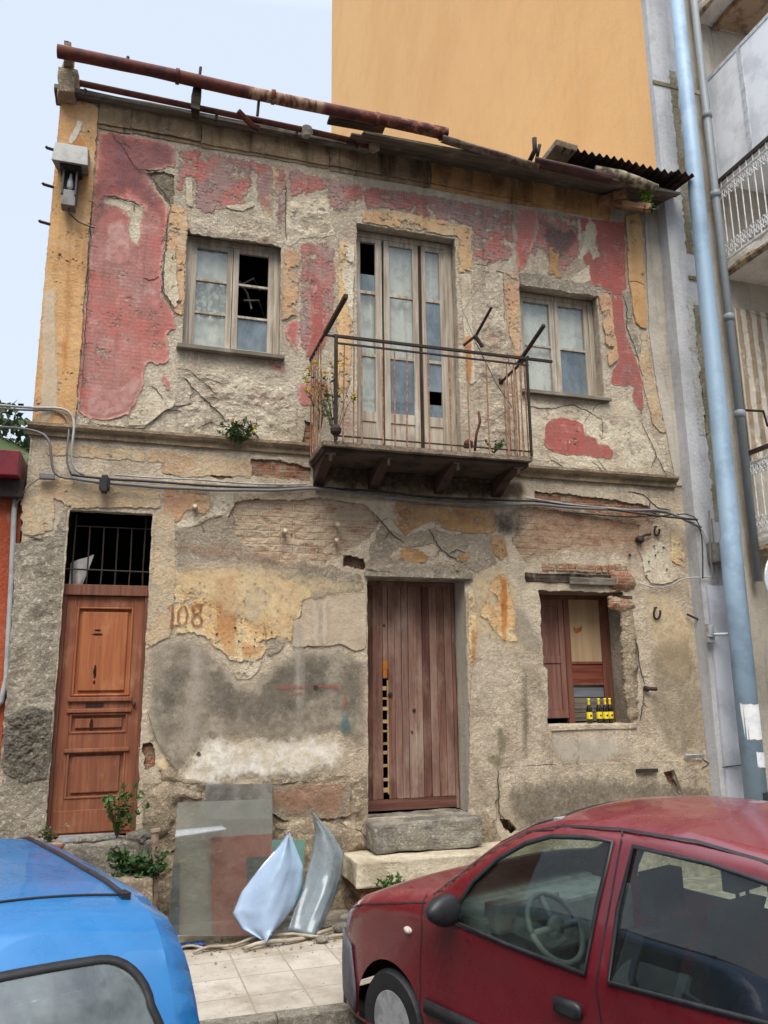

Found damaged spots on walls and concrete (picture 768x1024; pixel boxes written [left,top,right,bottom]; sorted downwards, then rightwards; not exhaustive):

flaking render [103,197,144,244]
spalling [148,172,193,206]
peeling [164,250,179,308]
flaking render [549,221,600,283]
crack [79,195,259,439]
spalling [622,291,640,357]
flaking render [163,473,379,570]
damp [150,602,364,787]
flaking render [138,742,155,770]
crack [495,738,579,821]